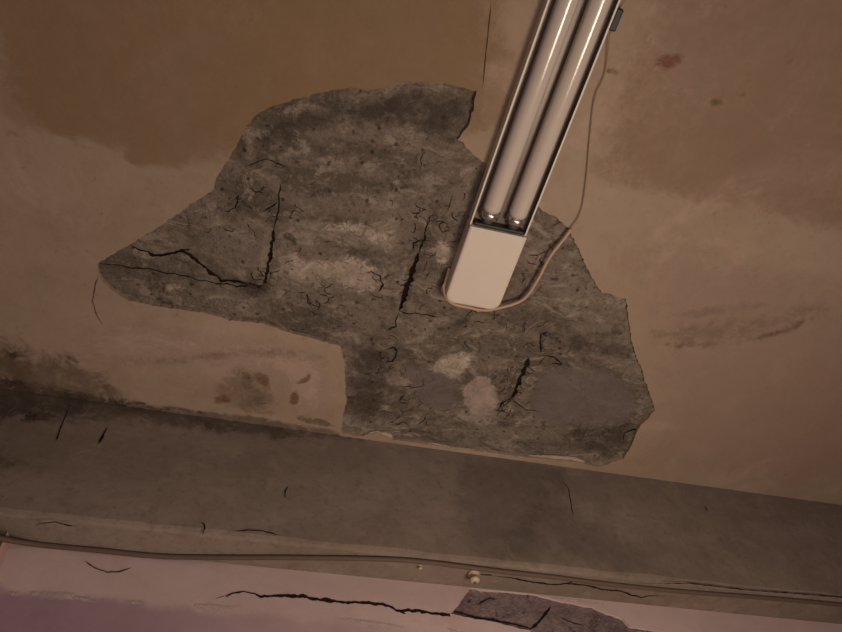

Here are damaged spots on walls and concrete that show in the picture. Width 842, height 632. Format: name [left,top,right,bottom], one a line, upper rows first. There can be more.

crack [92,159,289,323]
spalling [98,81,654,465]
crack [367,218,436,362]
crack [497,332,563,412]
crack [216,591,584,632]
spalling [452,589,653,632]
crack [481,574,842,598]